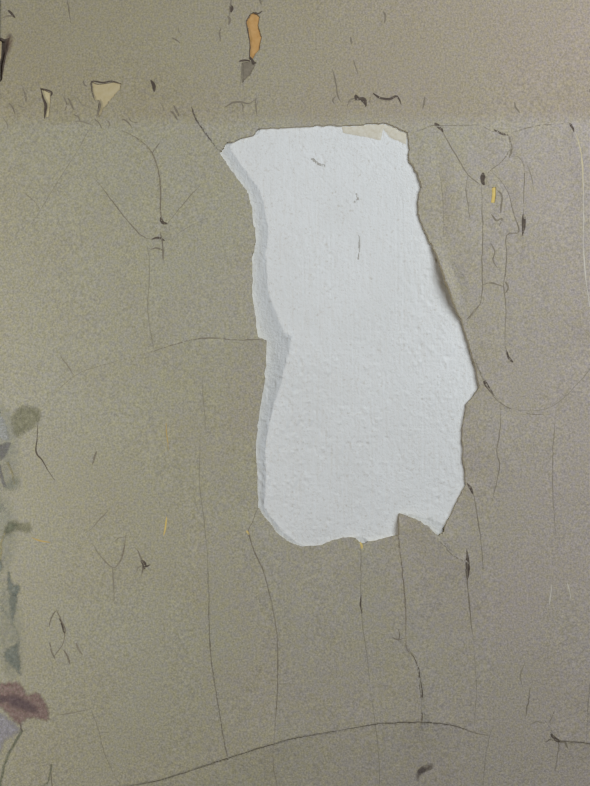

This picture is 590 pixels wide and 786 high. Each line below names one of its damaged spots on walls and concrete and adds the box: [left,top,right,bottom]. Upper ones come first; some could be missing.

peeling [242,12,262,83]
peeling [40,88,53,119]
peeling [90,80,121,117]
peeling [443,125,518,286]
peeling [143,106,500,759]
crack [61,359,590,786]
crack [49,610,83,664]